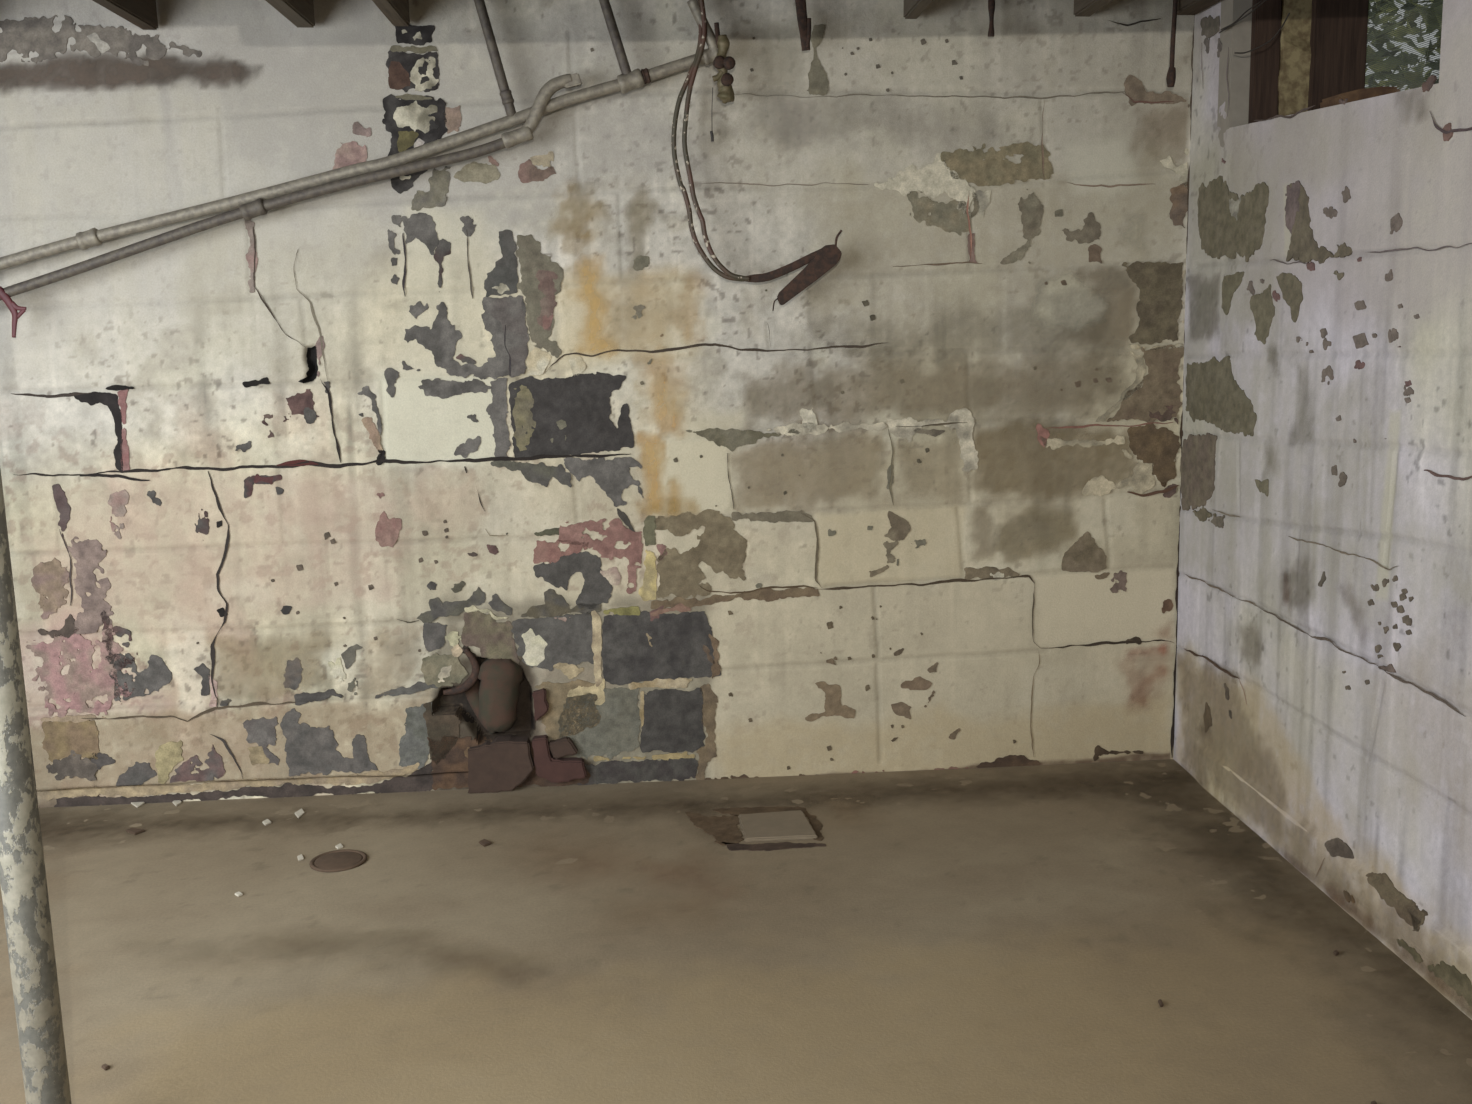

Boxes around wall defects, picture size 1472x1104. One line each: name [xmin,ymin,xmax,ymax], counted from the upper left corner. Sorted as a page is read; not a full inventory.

peeling [38,484,172,702]
peeling [235,336,325,452]
crack [13,220,629,779]
peeling [357,156,836,794]
crack [546,326,888,372]
damp [874,153,991,228]
damp [759,270,1218,497]
peeling [907,141,1102,265]
peeling [1107,261,1257,528]
peeling [1169,176,1353,385]
peeling [40,714,226,808]
peeling [243,708,378,777]